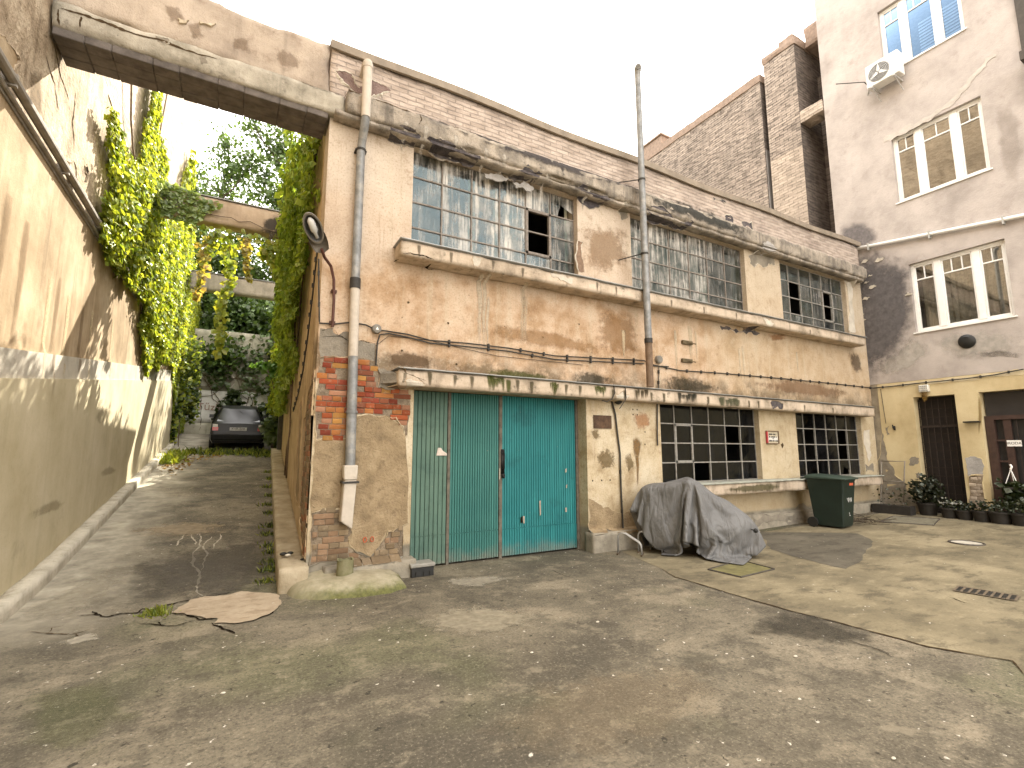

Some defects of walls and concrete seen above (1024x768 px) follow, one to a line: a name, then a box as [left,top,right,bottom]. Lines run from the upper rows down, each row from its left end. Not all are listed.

crack [46,8,216,143]
spalling [334,69,391,98]
spalling [387,124,543,192]
spalling [577,183,633,218]
spalling [646,205,694,231]
leakage [587,232,626,267]
leakage [843,225,913,366]
leakage [487,375,534,392]
leakage [595,386,665,401]
flaking render [299,327,425,567]
flaking render [965,456,986,510]
crack [32,592,276,637]